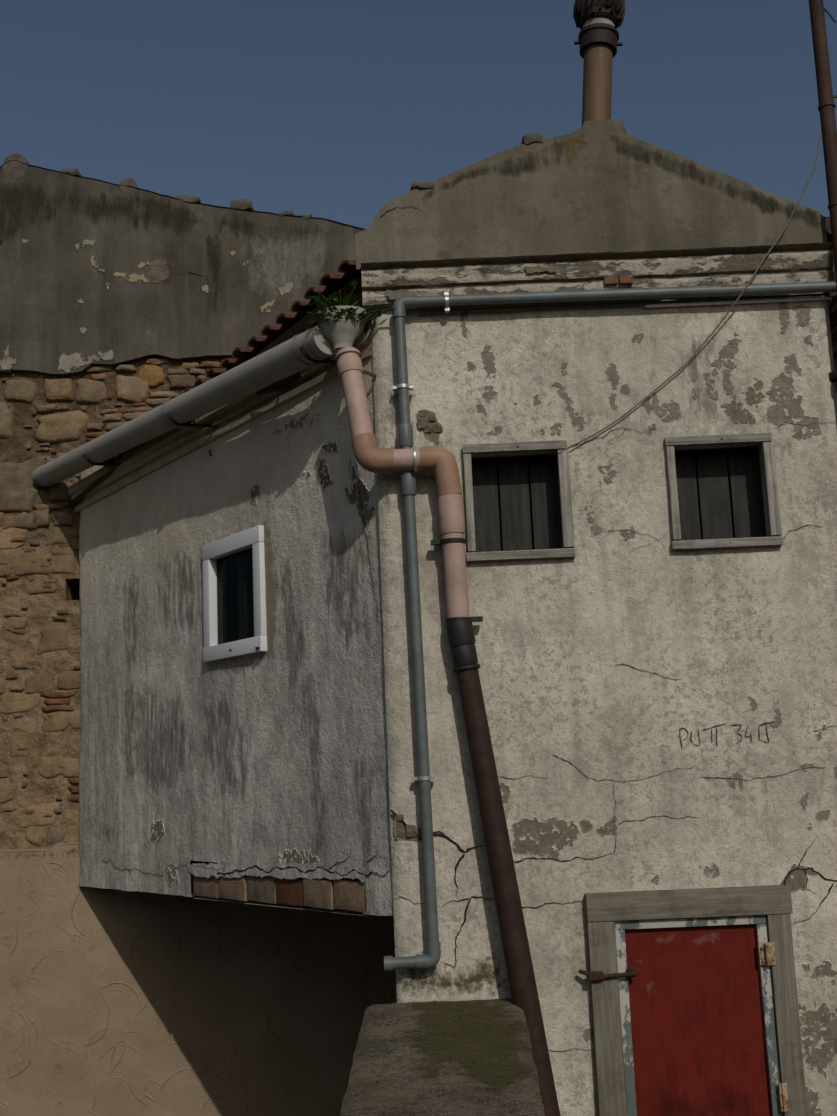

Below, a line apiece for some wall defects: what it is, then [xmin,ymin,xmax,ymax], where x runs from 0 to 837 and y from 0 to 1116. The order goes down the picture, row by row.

damp [751,192,817,225]
peeling [691,332,822,441]
damp [327,546,367,644]
damp [125,691,190,784]
damp [205,699,246,794]
spalling [166,848,366,913]
crack [101,831,495,968]
crack [390,810,407,828]
peeling [511,815,618,862]
crack [500,754,825,863]
crack [783,837,837,924]
peeling [798,1001,837,1116]